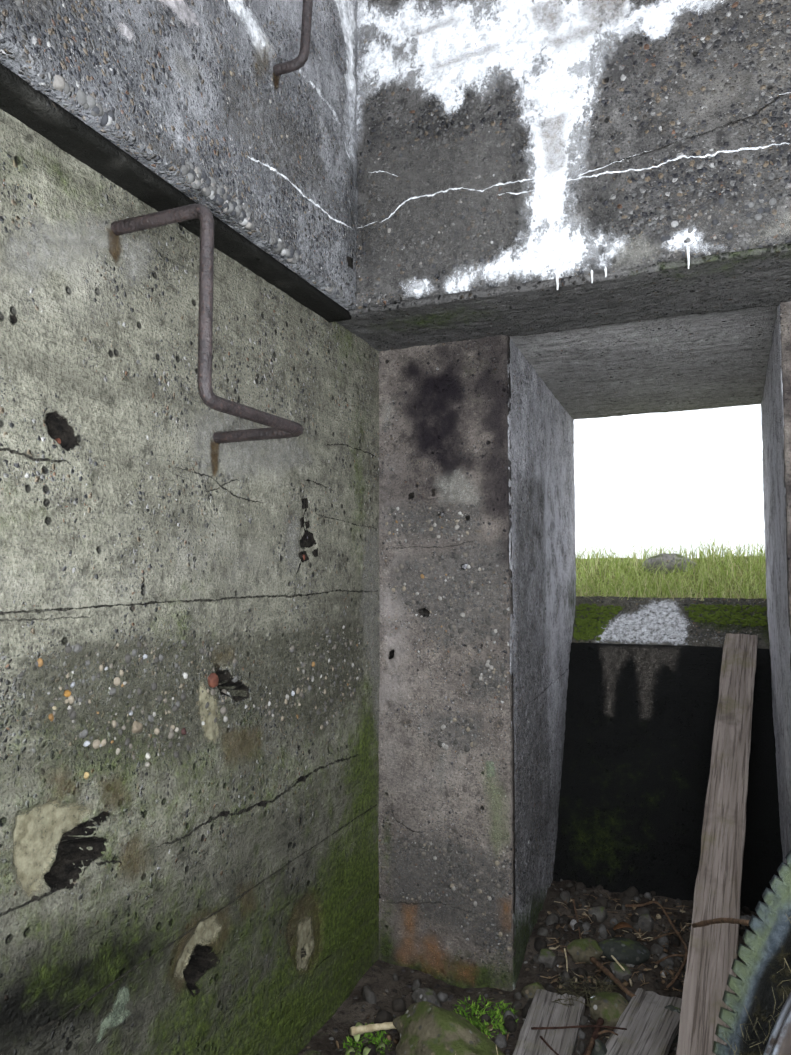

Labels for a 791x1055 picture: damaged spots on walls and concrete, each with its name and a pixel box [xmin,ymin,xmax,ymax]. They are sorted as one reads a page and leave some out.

crack [370,66,426,85]
crack [248,93,789,229]
water stain [334,0,715,293]
rust [108,229,121,262]
spalling [45,411,79,451]
rust [211,441,219,476]
spalling [19,625,363,768]
crack [161,754,358,845]
spalling [13,800,122,898]
spalling [174,915,220,997]
crack [0,804,425,1055]
spalling [296,917,331,970]